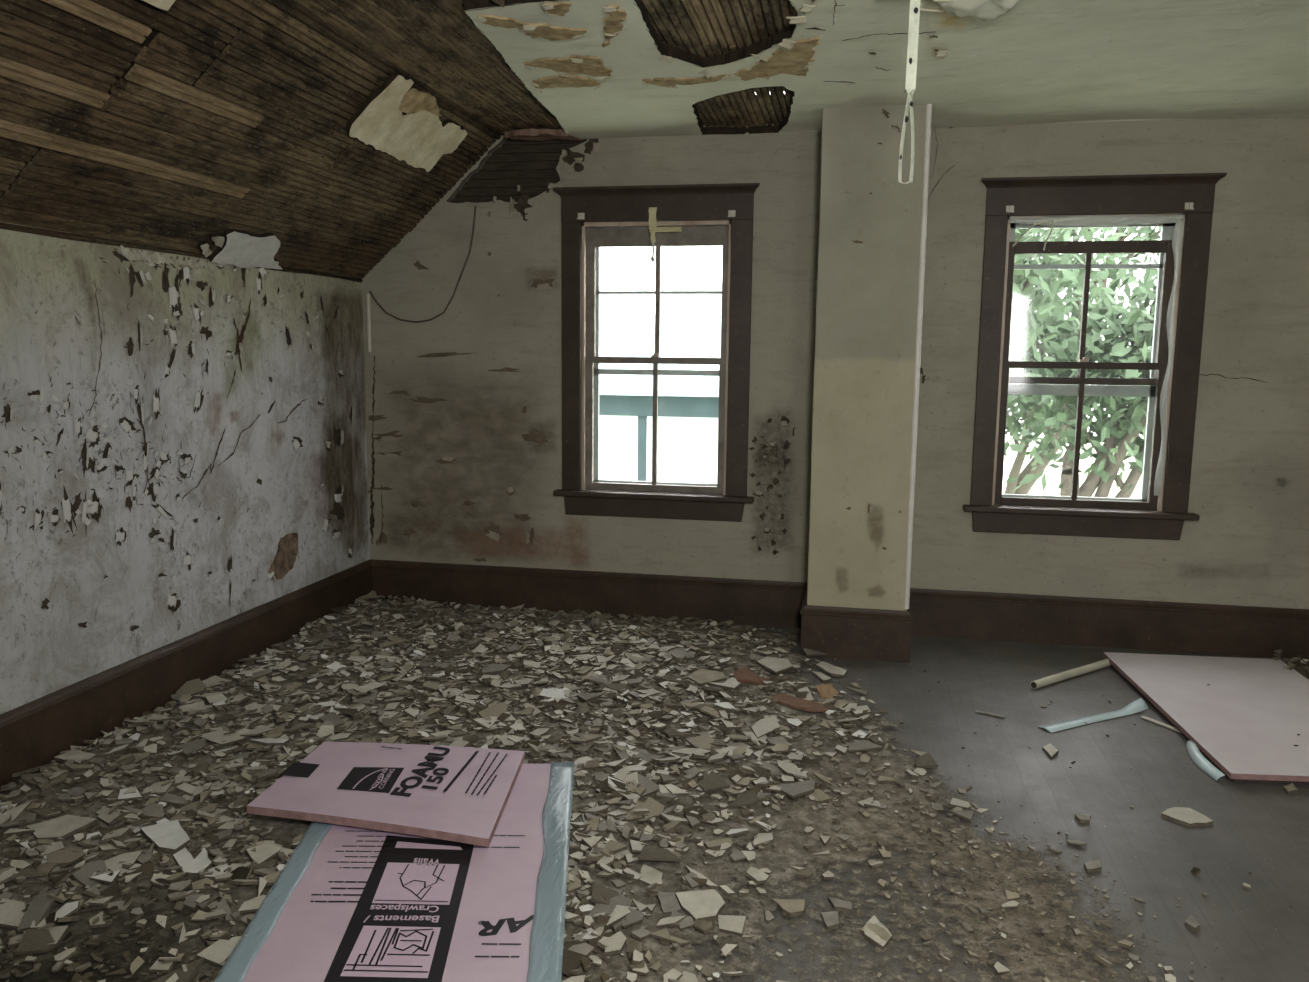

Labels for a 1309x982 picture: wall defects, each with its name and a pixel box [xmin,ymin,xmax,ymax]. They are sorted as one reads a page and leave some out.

peeling [0,243,339,609]
peeling [325,406,403,458]
peeling [320,482,353,558]
damp [749,416,797,555]
peeling [165,593,181,613]
spalling [54,749,96,764]